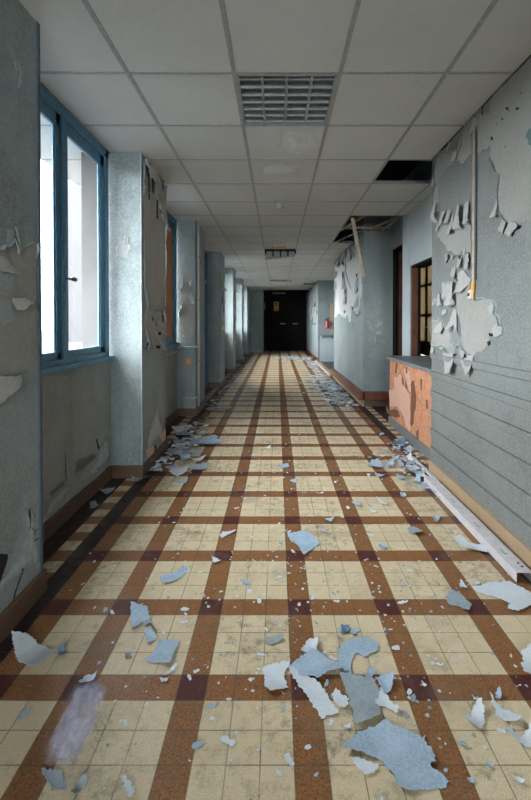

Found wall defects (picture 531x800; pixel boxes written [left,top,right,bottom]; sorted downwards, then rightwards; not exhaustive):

peeling [0,227,40,404]
peeling [143,157,171,351]
peeling [330,236,363,334]
peeling [429,58,531,376]
peeling [386,363,422,451]